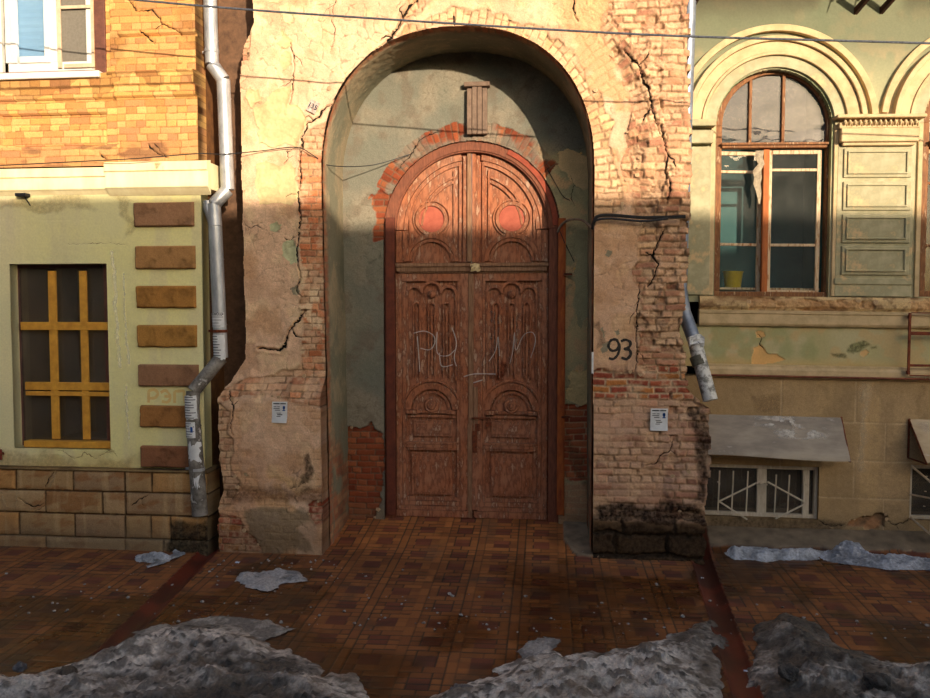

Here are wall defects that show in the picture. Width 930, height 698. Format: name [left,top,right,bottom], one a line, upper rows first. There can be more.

crack [130,2,180,44]
crack [375,0,418,51]
crack [259,43,334,351]
crack [625,52,676,198]
spalling [217,85,330,553]
spalling [393,0,712,565]
peeling [751,330,785,364]
spalling [348,422,385,518]
water stain [593,410,837,565]